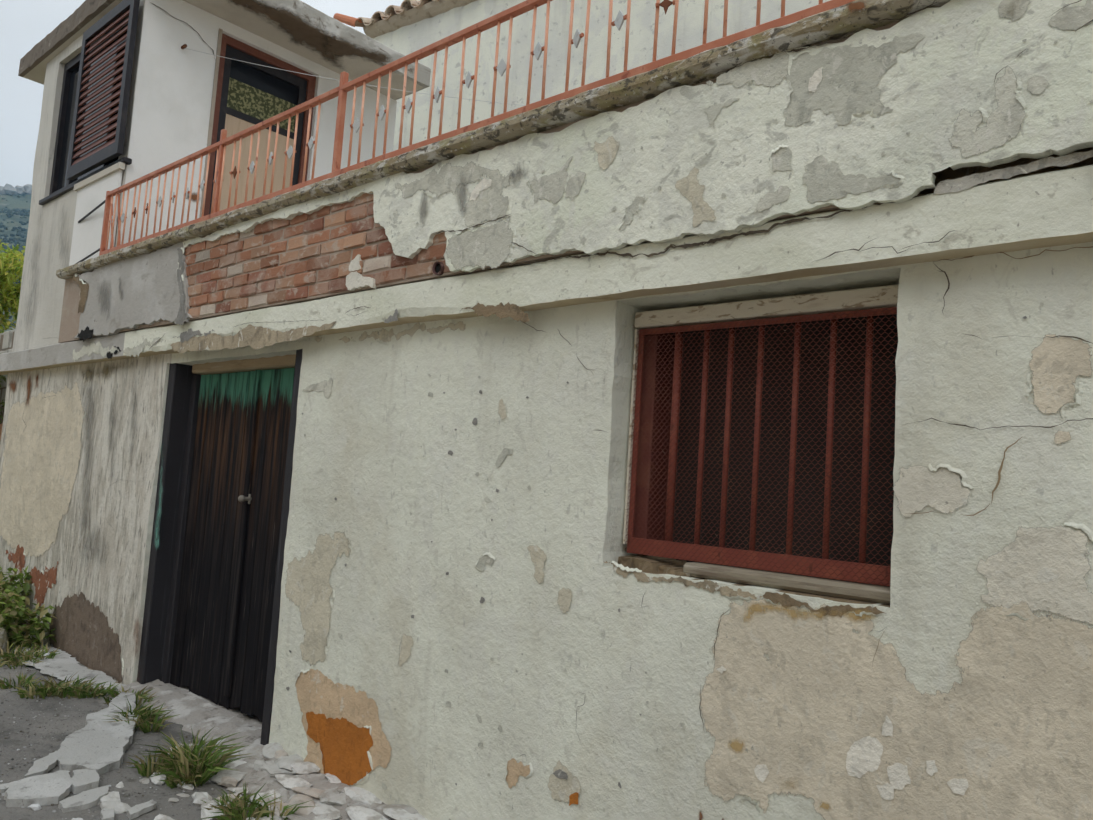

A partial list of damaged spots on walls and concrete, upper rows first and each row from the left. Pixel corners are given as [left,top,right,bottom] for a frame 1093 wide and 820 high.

peeling [593,136,620,170]
peeling [611,196,652,230]
peeling [675,167,716,227]
flaking render [72,156,586,362]
water stain [85,366,117,437]
peeling [1025,334,1093,418]
peeling [0,382,124,683]
peeling [893,464,974,517]
crack [902,418,1093,516]
peeling [285,531,392,786]
peeling [604,522,1093,820]